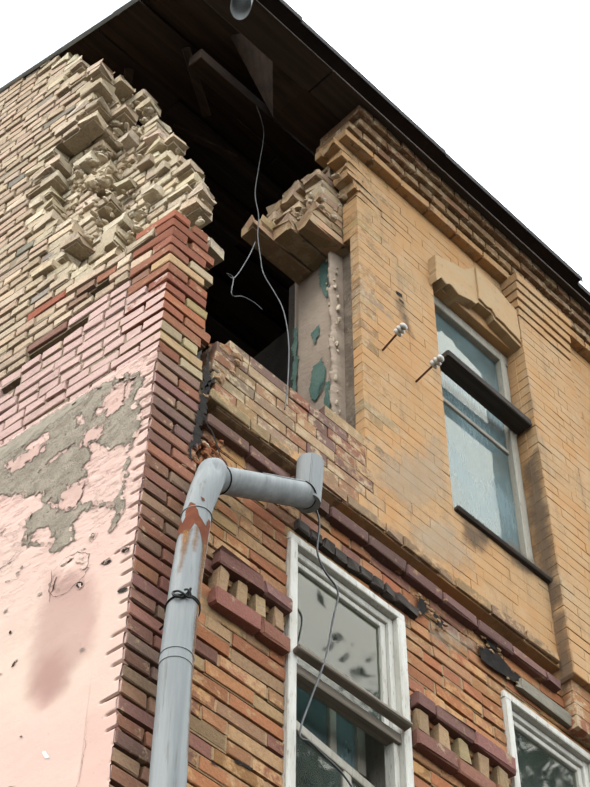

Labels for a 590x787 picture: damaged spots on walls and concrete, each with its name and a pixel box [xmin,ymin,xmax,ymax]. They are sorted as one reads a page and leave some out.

spalling [60,98,183,251]
peeling [311,259,341,353]
peeling [0,370,145,553]
peeling [309,358,341,414]